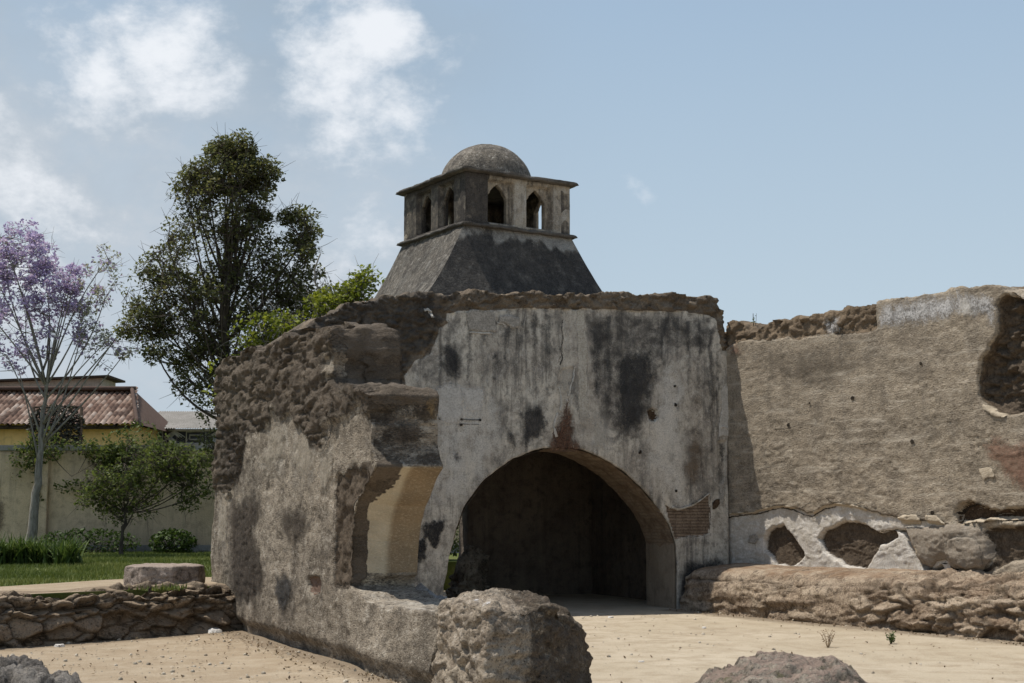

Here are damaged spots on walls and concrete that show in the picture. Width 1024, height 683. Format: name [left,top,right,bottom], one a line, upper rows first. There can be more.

damp [442,345,470,378]
damp [577,310,651,445]
flaking render [879,292,1024,418]
damp [507,407,548,444]
rust [550,403,580,452]
peeling [719,386,729,461]
damp [418,520,444,563]
flaking render [665,483,951,570]